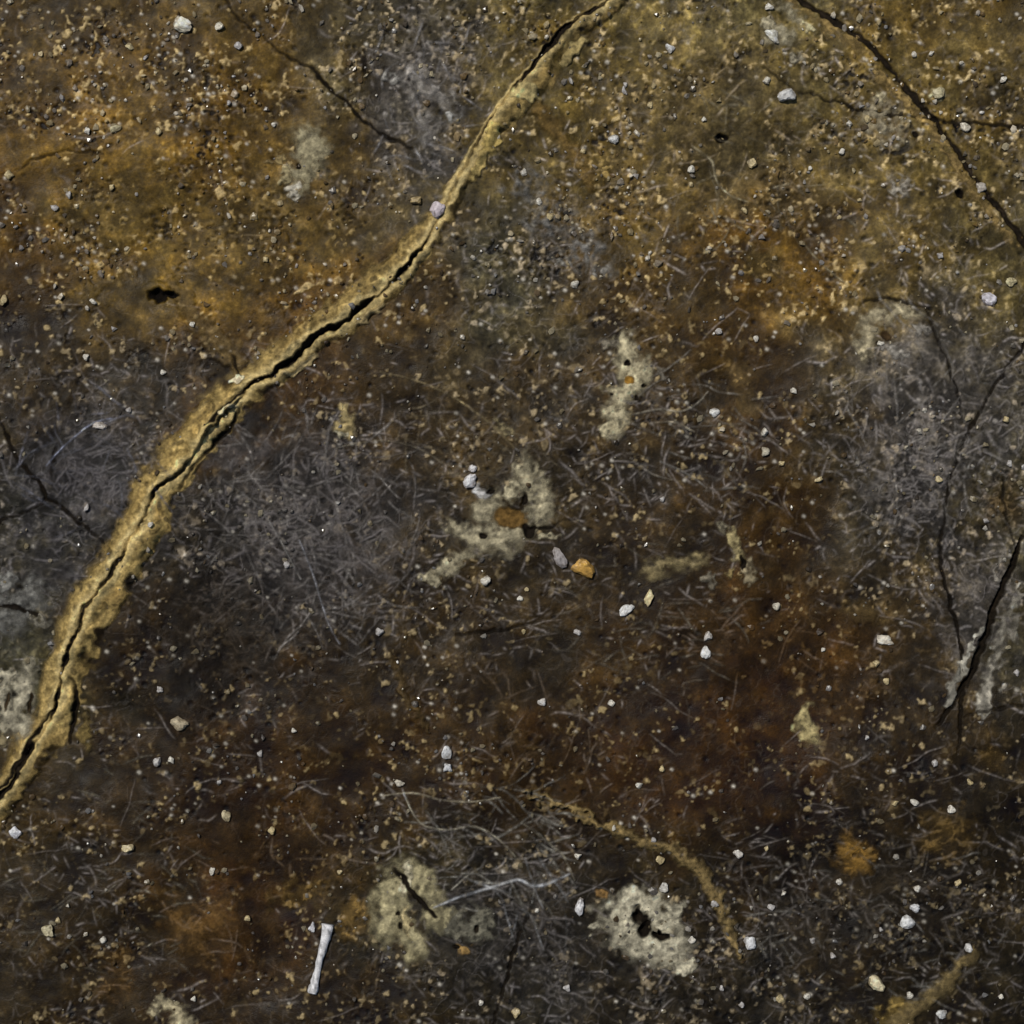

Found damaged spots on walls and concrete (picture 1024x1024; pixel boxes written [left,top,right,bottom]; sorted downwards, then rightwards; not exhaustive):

crack [772,0,1024,247]
crack [0,0,625,831]
crack [862,296,1024,747]